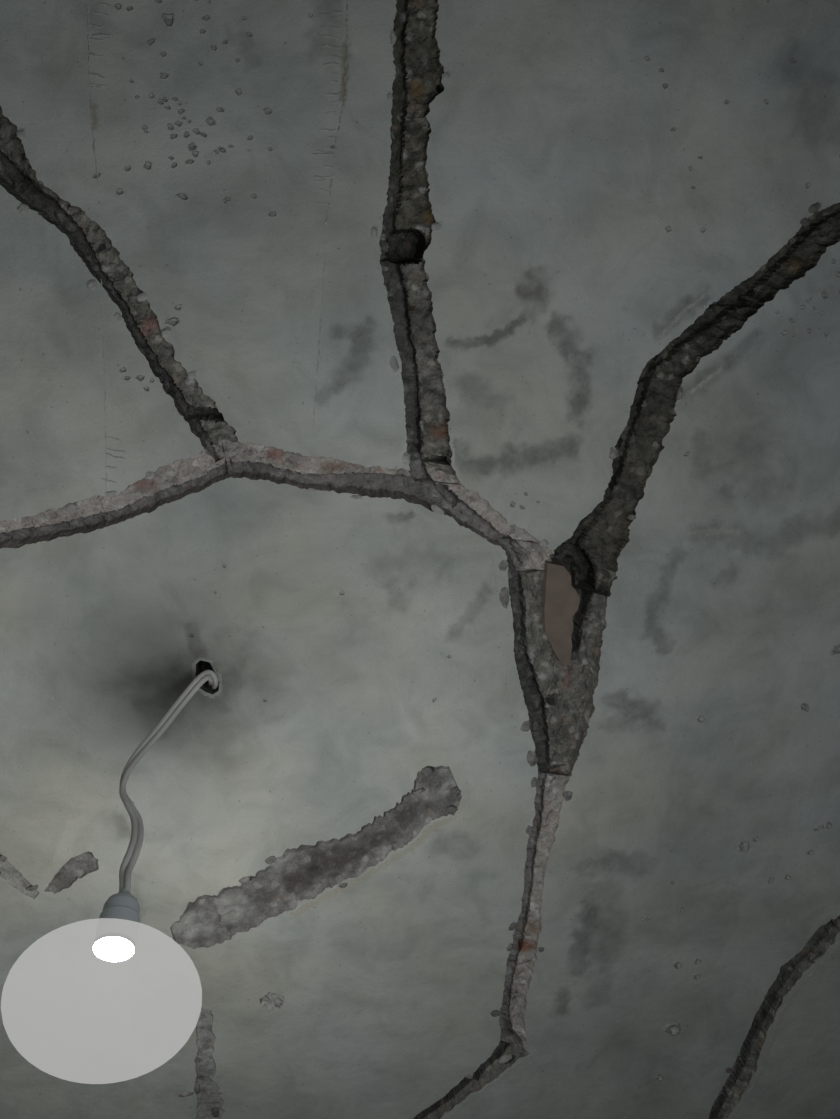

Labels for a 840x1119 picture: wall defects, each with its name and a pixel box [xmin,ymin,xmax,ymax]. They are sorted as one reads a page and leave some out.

crack [0,0,840,666]
crack [0,853,39,899]
spalling [170,766,462,949]
crack [413,546,608,1119]
spalling [179,1008,225,1119]
crack [709,915,840,1119]